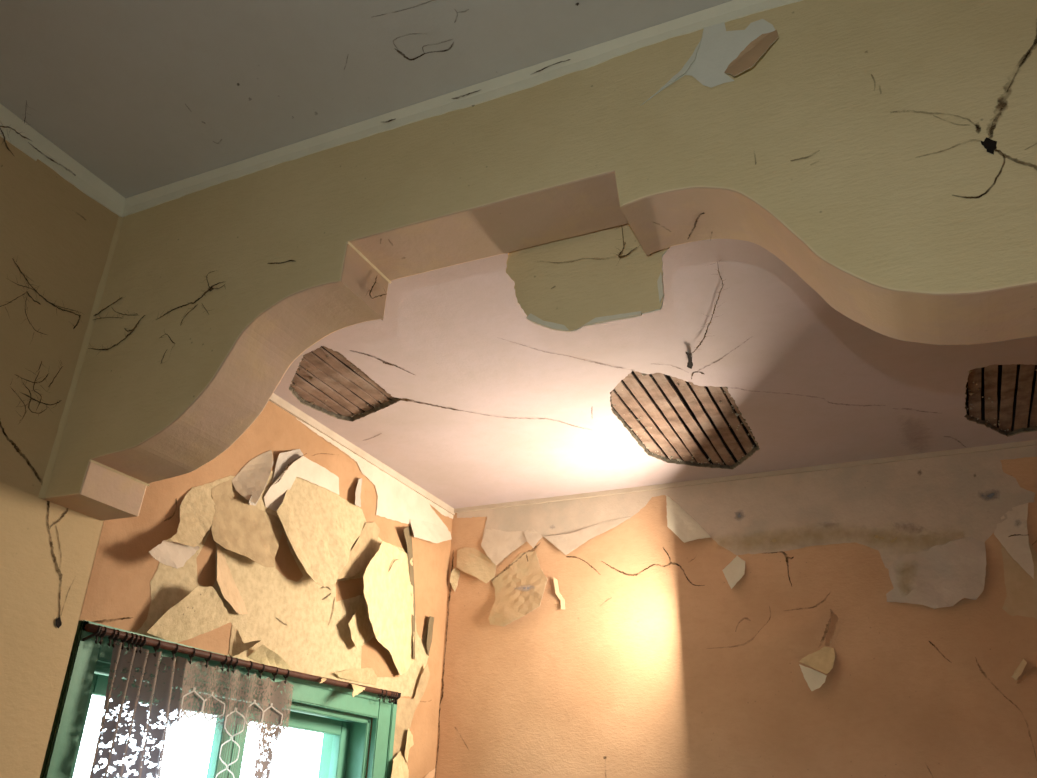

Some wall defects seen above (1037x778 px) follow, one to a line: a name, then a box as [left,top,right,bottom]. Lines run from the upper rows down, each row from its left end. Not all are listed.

crack [394,22,455,60]
peeling [640,19,779,106]
crack [957,30,1037,199]
crack [88,271,226,358]
peeling [506,224,670,332]
spalling [289,346,400,421]
crack [350,350,462,411]
crack [0,421,68,628]
crack [492,544,539,581]
peeling [136,364,1037,778]
crack [567,548,705,586]
crack [771,551,794,586]